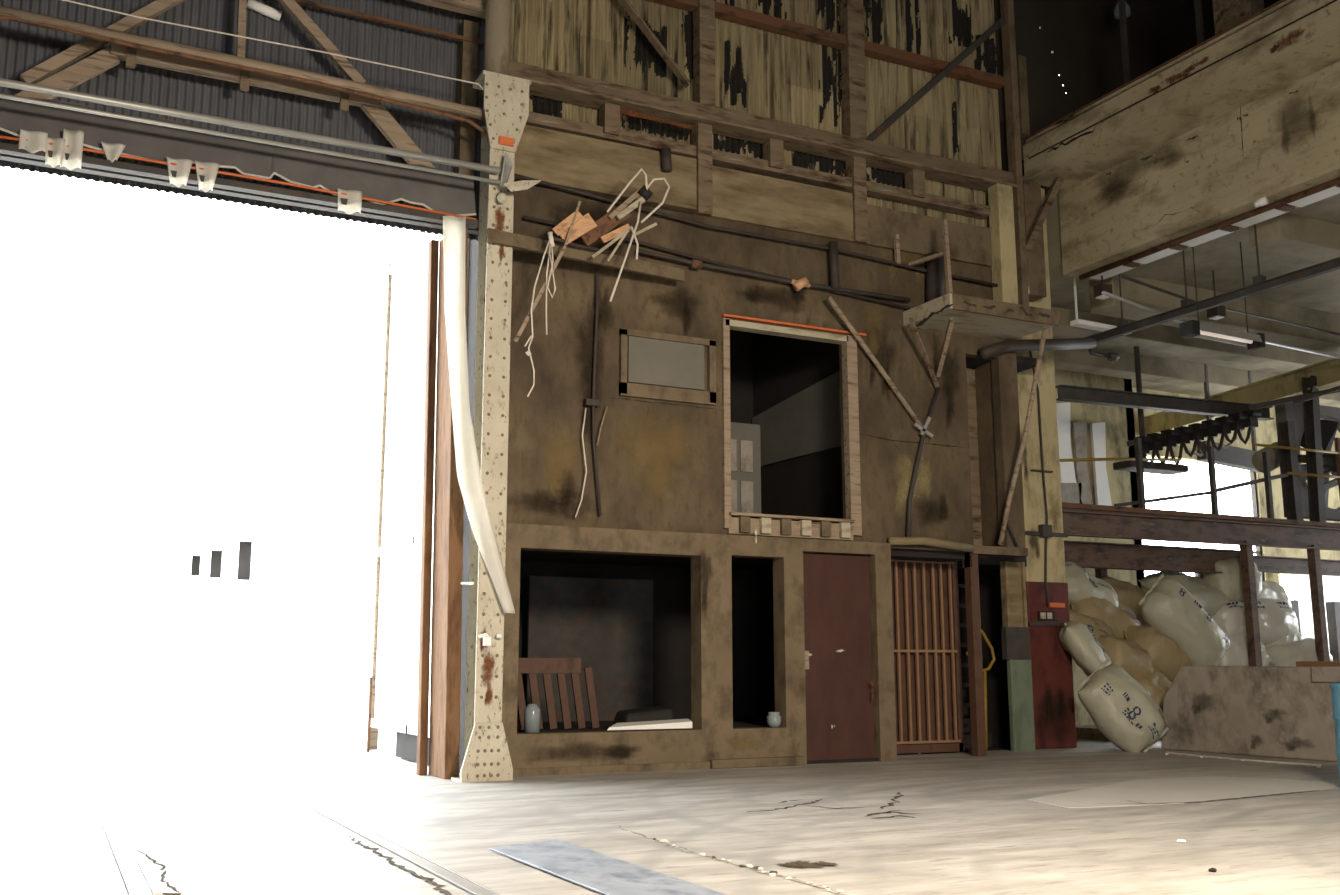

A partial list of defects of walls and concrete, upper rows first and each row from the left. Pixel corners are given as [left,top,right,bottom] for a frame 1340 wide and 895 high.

peeling [529,95,562,118]
peeling [624,11,693,82]
peeling [724,40,747,108]
peeling [715,0,787,20]
peeling [816,0,842,127]
peeling [863,0,883,45]
corrosion [480,630,494,704]
crack [348,835,452,895]
crack [614,825,845,895]